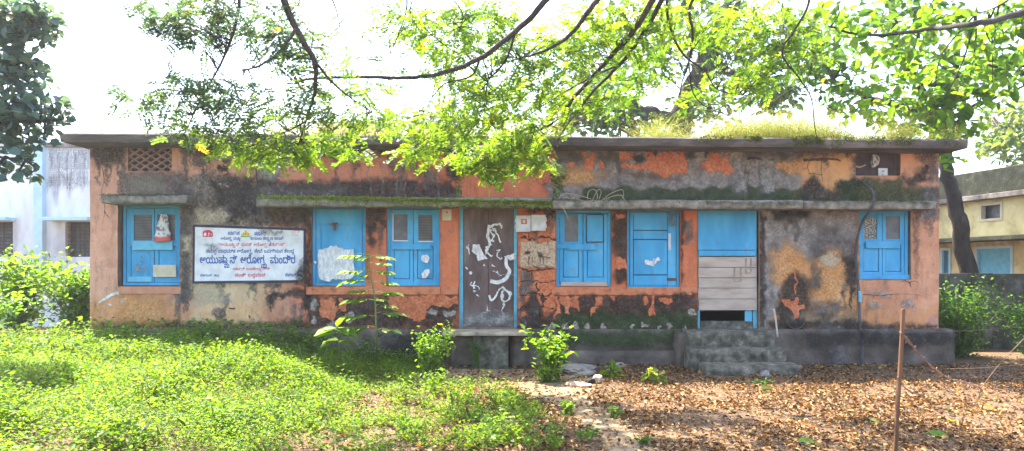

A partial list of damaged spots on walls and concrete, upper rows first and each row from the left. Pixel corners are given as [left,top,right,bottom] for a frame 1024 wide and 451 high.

water stain [49,148,471,325]
peeling [266,287,459,329]
peeling [470,218,698,329]
peeling [536,150,860,329]
water stain [759,210,957,365]